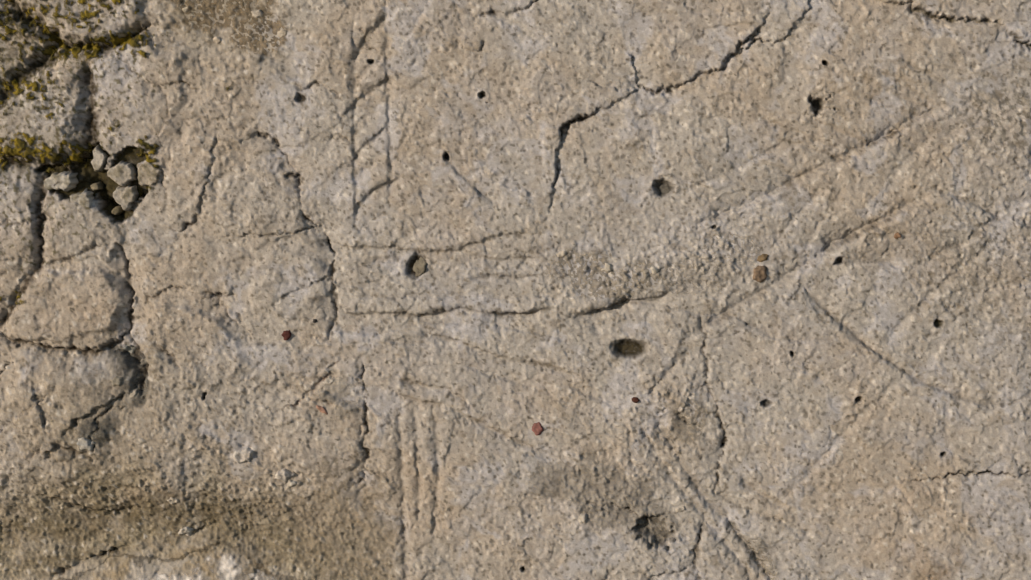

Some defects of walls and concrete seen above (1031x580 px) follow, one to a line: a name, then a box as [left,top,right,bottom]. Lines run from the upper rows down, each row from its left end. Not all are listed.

crack [0,1,168,376]
crack [560,115,586,133]